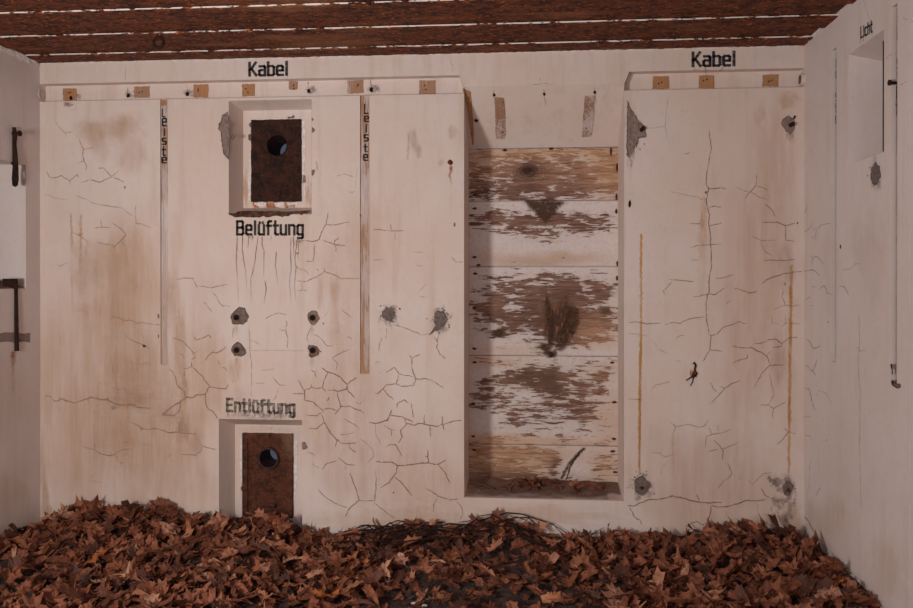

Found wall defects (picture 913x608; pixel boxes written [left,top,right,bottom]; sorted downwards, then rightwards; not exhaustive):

flaking render [218,111,234,159]
flaking render [228,115,315,218]
flaking render [626,101,646,158]
crack [299,215,357,291]
crack [630,134,818,444]
crack [45,337,228,455]
crack [267,313,463,518]
crack [628,424,773,525]